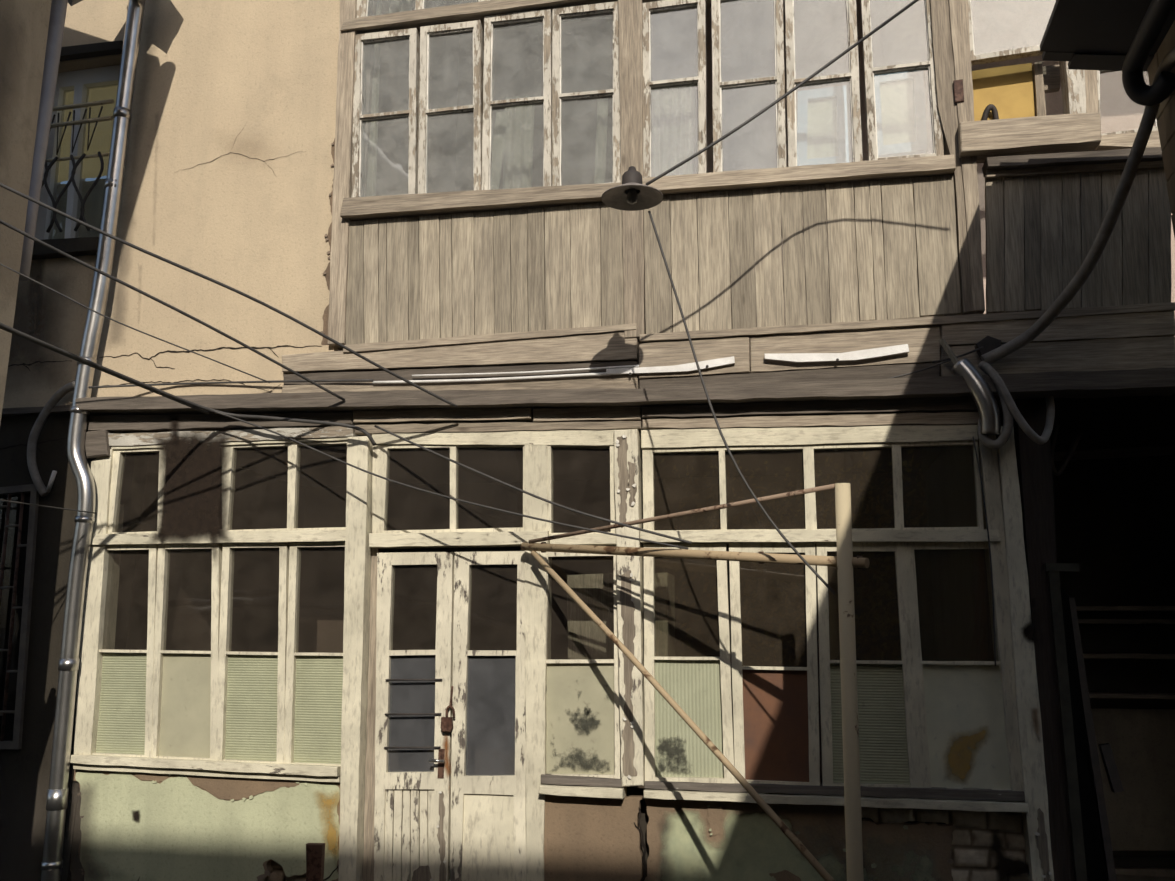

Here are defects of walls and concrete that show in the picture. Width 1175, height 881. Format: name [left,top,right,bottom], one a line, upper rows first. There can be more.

crack [177,124,301,176]
crack [99,345,316,391]
peeling [135,772,171,783]
peeling [186,775,341,802]
spalling [70,788,85,881]
spalling [257,860,306,881]
crack [634,808,647,881]
spalling [861,807,1052,881]